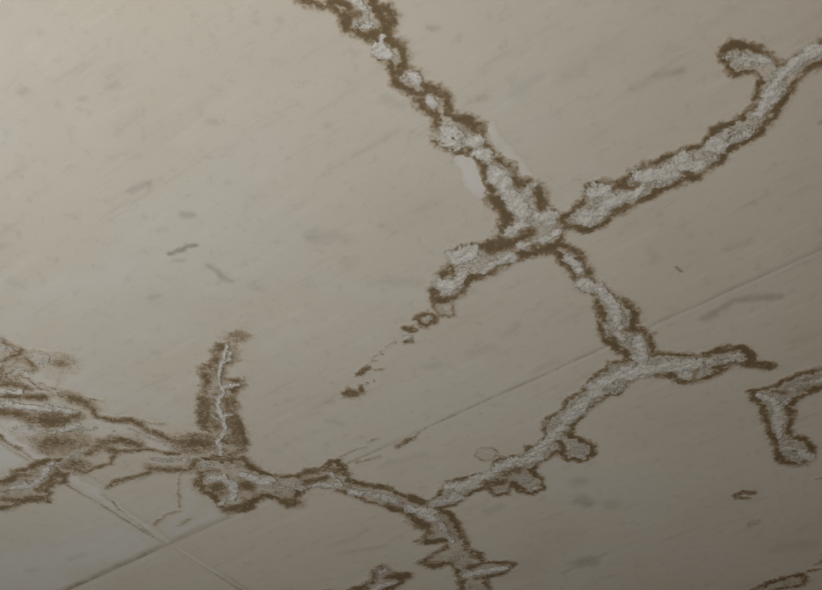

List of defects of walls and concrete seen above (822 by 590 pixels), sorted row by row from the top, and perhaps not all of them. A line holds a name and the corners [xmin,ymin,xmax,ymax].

crack [0,457,71,514]
crack [185,0,822,590]